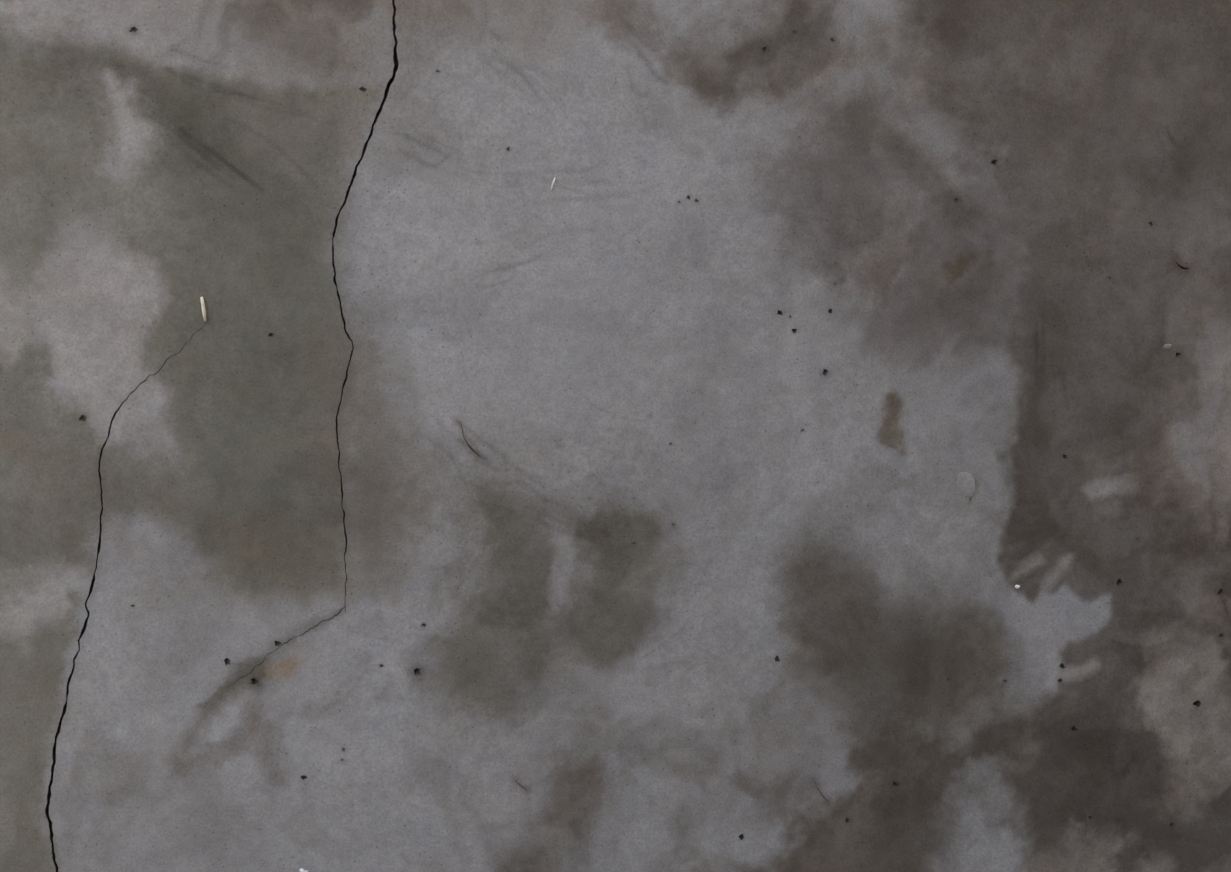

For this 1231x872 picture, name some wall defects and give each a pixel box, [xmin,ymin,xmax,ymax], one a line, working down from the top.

crack [45,324,205,872]
crack [231,0,399,686]
leakage [0,0,710,872]
leakage [569,0,1231,872]